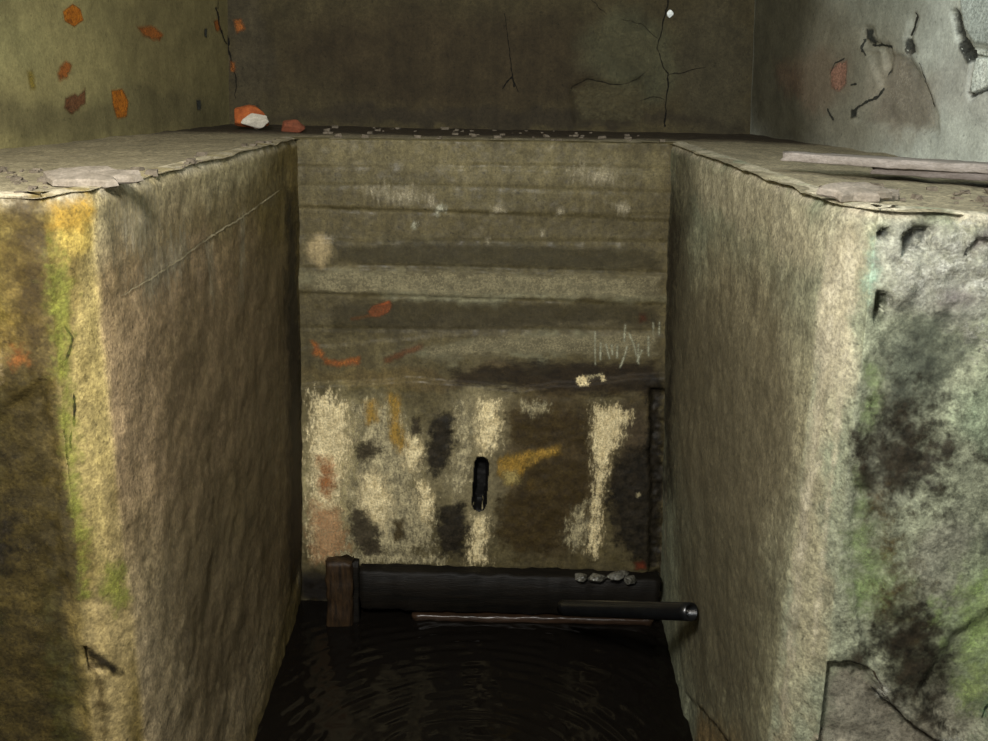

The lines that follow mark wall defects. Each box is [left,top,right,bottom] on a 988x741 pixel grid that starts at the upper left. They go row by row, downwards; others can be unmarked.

crack [594,0,706,127]
spalling [851,88,885,118]
spalling [860,29,893,56]
spalling [905,12,935,107]
flaking render [955,0,988,97]
leakage [3,196,53,371]
spalling [0,136,676,741]
leakage [284,193,680,589]
spalling [650,141,988,741]
leakage [794,219,988,563]
leakage [0,371,70,741]
leakage [851,564,954,733]